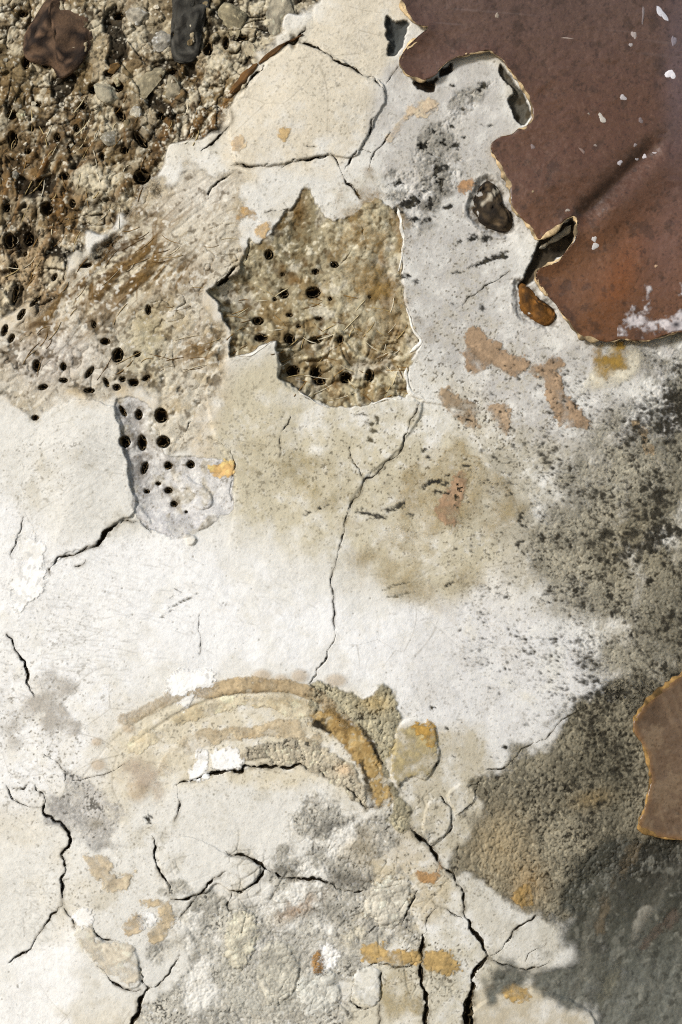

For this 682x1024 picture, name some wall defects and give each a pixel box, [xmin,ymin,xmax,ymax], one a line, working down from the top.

water stain [393,125,466,224]
flaking render [0,123,458,539]
rust [346,264,403,317]
rust [518,283,555,326]
flaking render [165,667,216,713]
water stain [356,346,682,1024]
crack [175,763,372,818]
crack [6,786,120,962]
crack [153,839,362,913]
flaking render [138,681,419,1024]
crack [351,717,567,1024]
crack [97,960,177,1024]